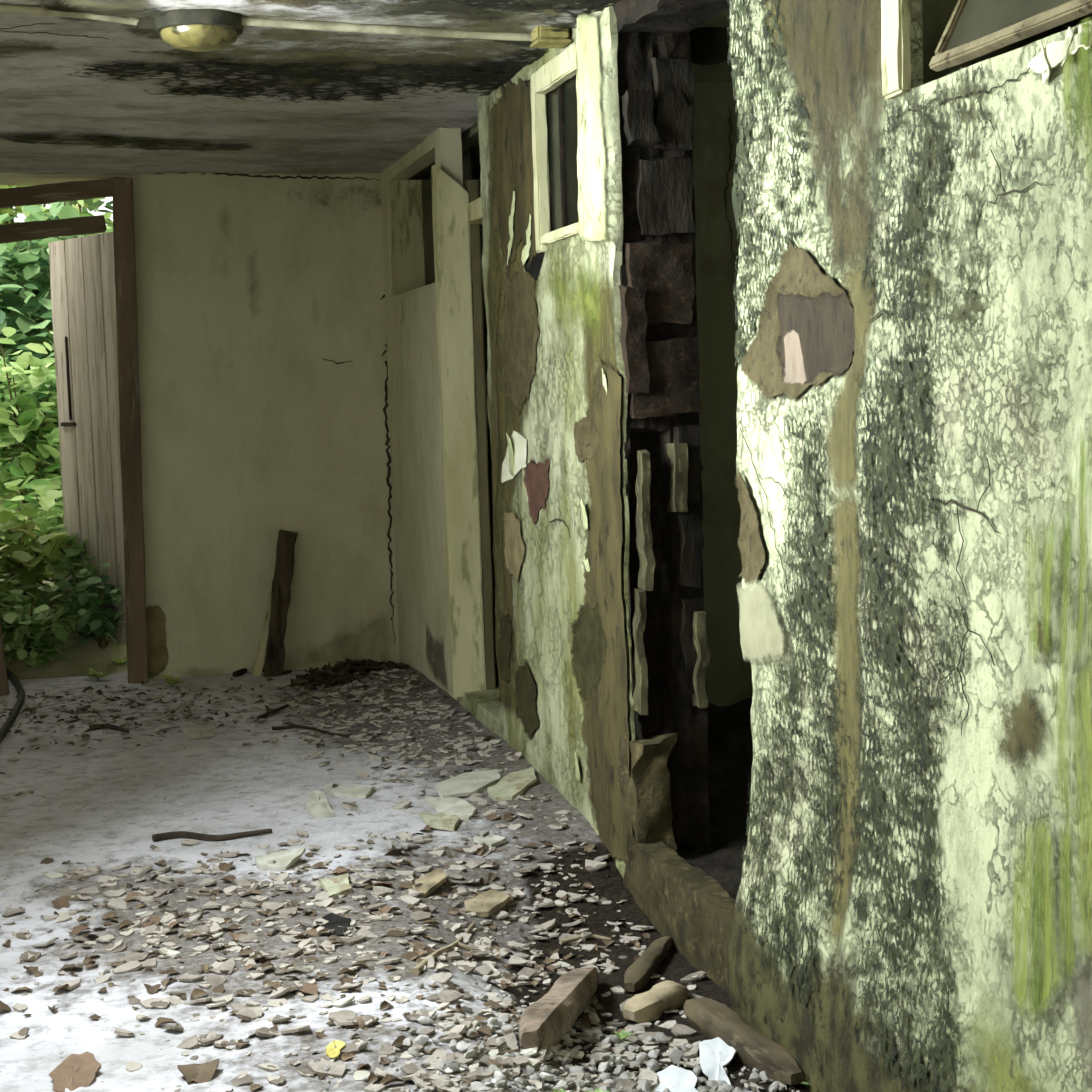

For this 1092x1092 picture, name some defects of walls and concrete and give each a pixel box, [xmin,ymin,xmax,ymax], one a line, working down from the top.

leakage [38,0,620,103]
spalling [488,78,540,413]
spalling [741,240,855,400]
crack [886,67,1053,207]
crack [380,295,403,643]
leakage [487,209,544,712]
spalling [501,431,550,583]
spalling [735,468,765,584]
crack [740,428,792,603]
leakage [727,0,1039,1092]
crack [929,458,1000,736]
leakage [997,441,1092,1064]